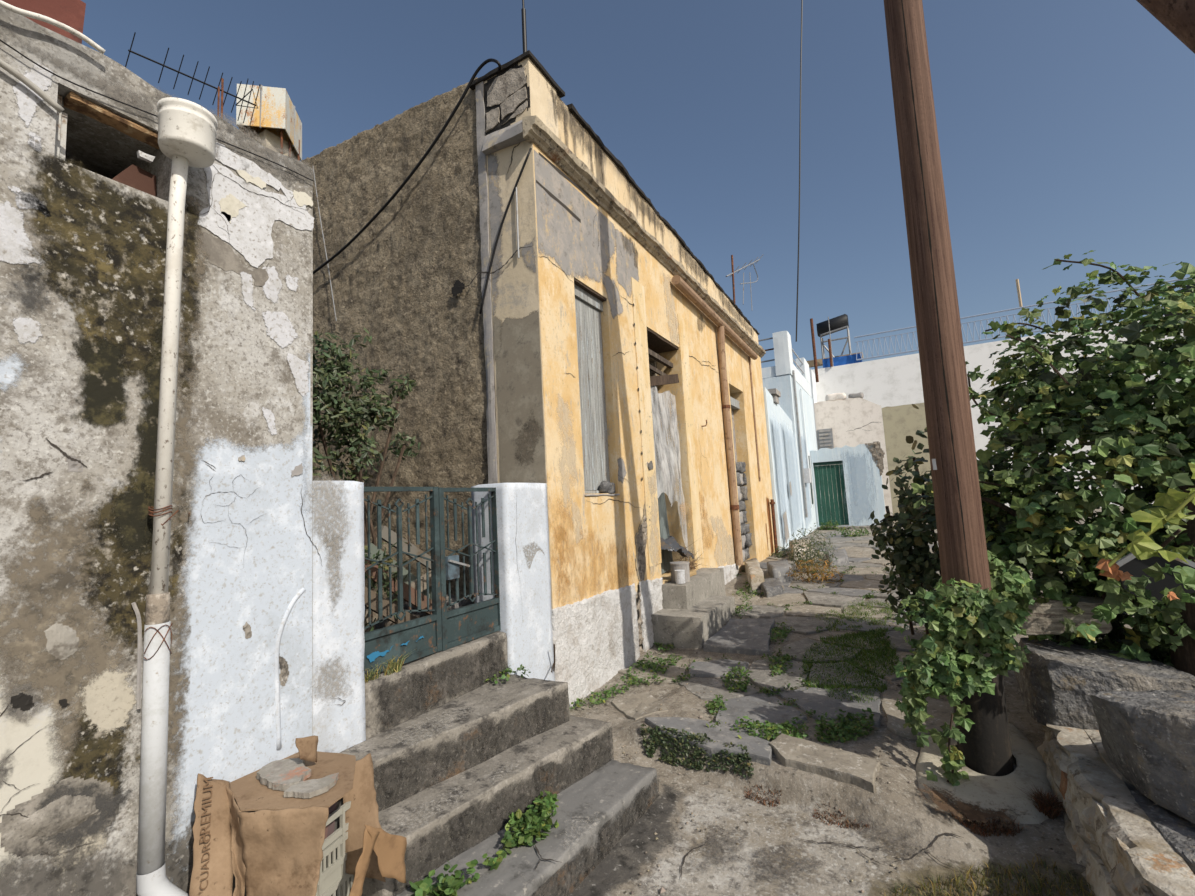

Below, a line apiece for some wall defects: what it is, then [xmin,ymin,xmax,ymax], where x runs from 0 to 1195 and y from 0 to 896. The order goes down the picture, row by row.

peeling [0,186,51,265]
flaking render [520,150,639,319]
water stain [10,266,49,309]
crack [201,461,262,553]
peeling [167,142,314,880]